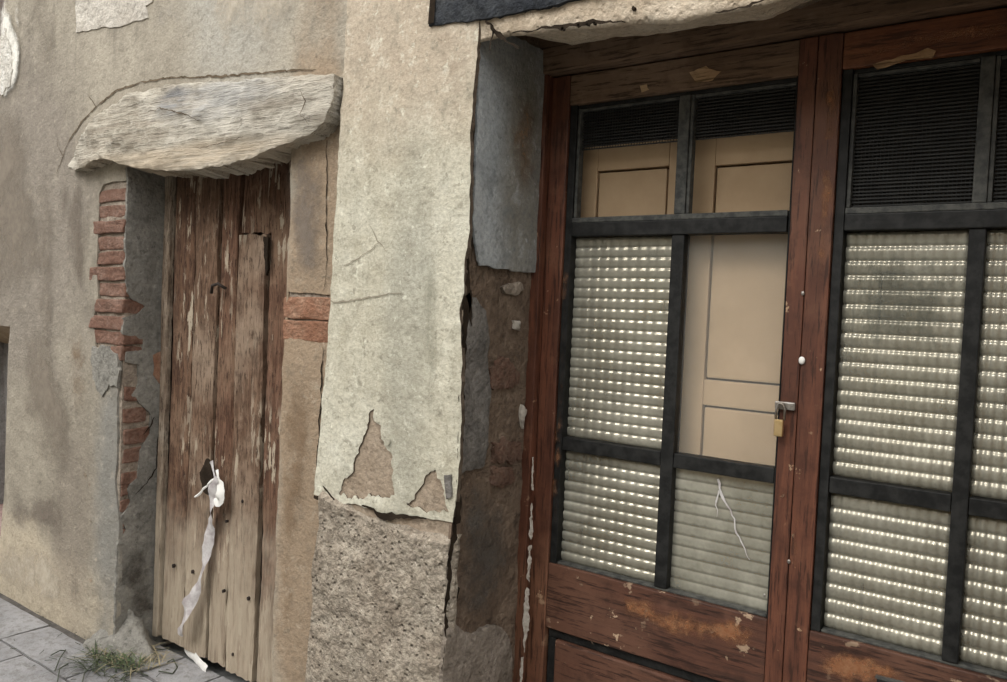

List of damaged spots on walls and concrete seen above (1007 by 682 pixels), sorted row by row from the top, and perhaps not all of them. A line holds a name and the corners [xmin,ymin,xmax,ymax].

crack [715,0,764,13]
crack [485,19,626,51]
flaking render [88,188,144,361]
spalling [500,282,524,296]
spalling [519,404,527,429]
flaking render [119,386,150,512]
flaking render [340,410,394,499]
flaking render [408,470,453,512]
peeling [520,503,533,682]